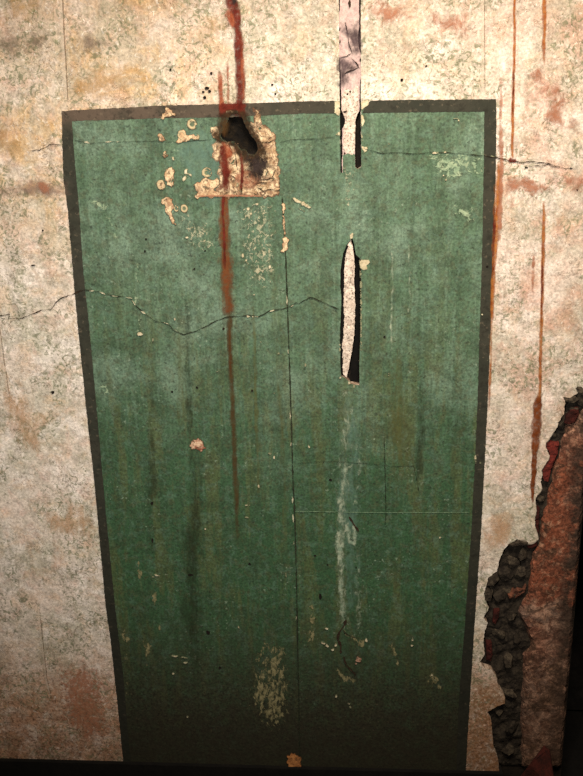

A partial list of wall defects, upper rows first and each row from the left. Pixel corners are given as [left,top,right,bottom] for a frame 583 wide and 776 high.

rust [218,0,245,115]
spalling [156,107,311,295]
crack [367,149,572,169]
rust [491,0,547,320]
rust [546,87,565,123]
rust [220,144,252,508]
rust [530,205,545,502]
crack [0,235,469,763]
damp [336,468,356,619]
spalling [481,386,583,769]
peeling [253,643,288,726]